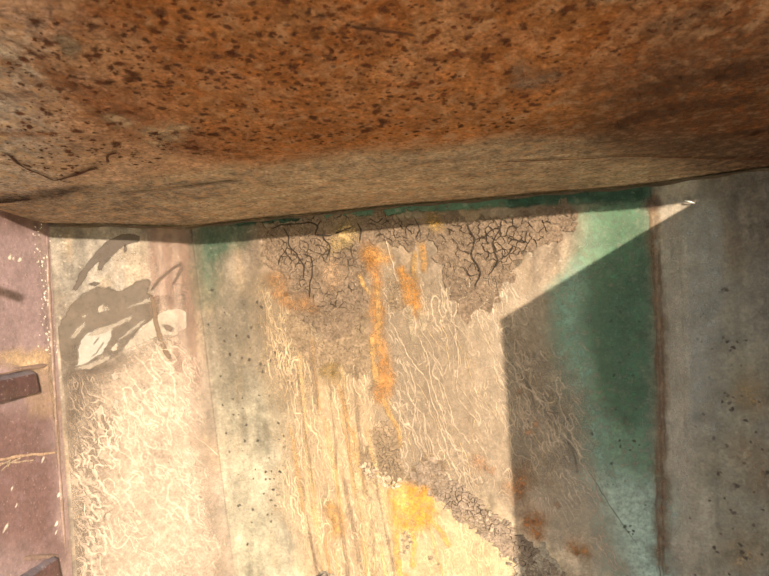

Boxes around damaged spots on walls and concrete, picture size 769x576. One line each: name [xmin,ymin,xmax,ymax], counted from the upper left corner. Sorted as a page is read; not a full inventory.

corrosion [359,247,402,442]
leakage [386,285,495,510]
corrosion [388,484,451,575]